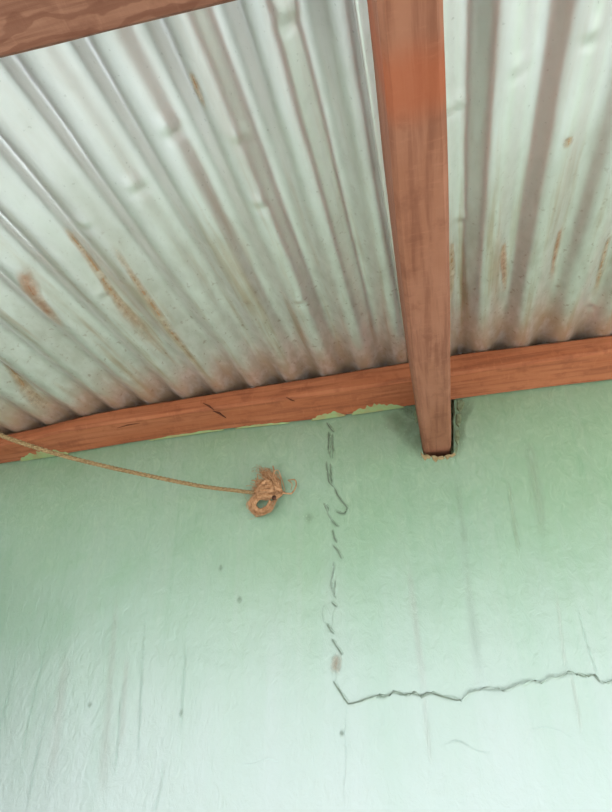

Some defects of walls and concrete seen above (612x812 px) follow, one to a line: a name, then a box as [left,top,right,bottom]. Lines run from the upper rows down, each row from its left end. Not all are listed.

corrosion [71,236,133,319]
crack [322,422,349,655]
crack [333,670,612,707]